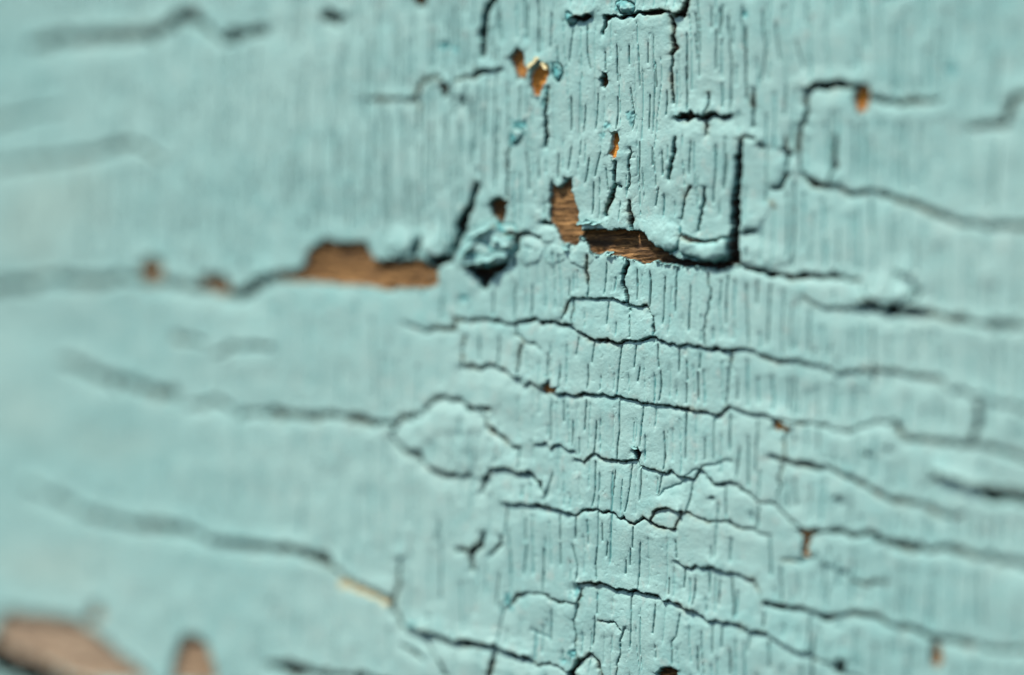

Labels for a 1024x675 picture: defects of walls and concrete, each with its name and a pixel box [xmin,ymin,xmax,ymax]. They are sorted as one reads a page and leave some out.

peeling [508,47,550,97]
peeling [608,132,620,162]
crack [365,0,1024,265]
peeling [852,83,873,115]
peeling [547,139,765,271]
peeling [270,237,442,292]
peeling [456,196,510,290]
crack [0,219,1024,675]
peeling [0,606,147,675]
peeling [170,633,216,675]